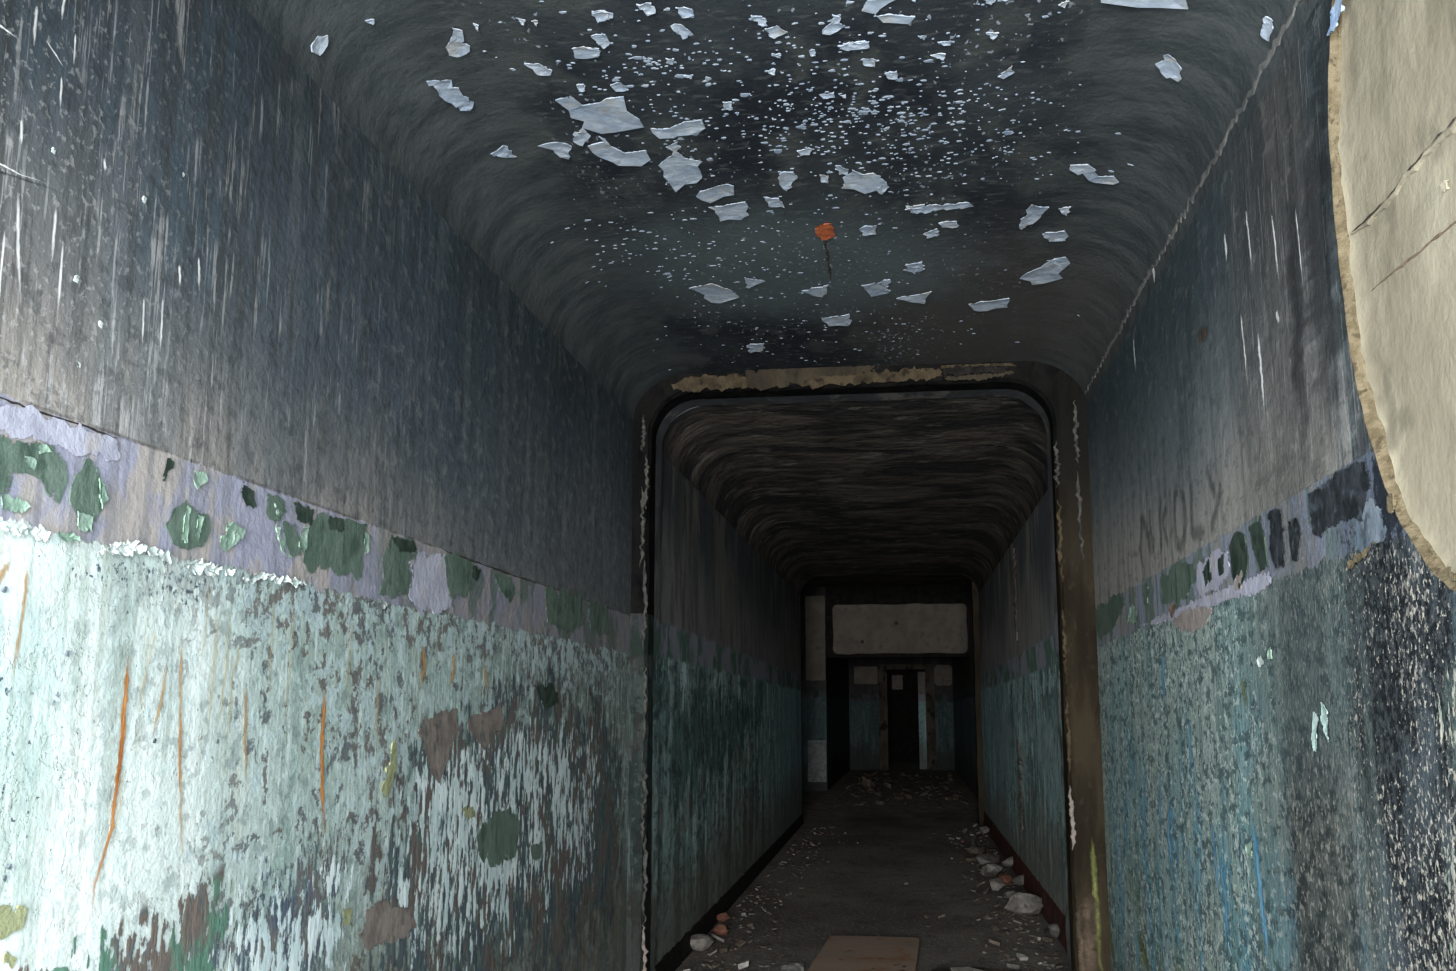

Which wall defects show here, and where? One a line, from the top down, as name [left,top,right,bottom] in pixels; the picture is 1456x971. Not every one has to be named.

peeling [311,35,328,56]
peeling [426,79,474,111]
flaking render [446,0,1071,393]
peeling [1030,125,1134,185]
flaking render [1095,0,1456,640]
rust [94,668,129,888]
rust [155,656,182,821]
peeling [0,404,650,971]
peeling [1256,647,1273,667]